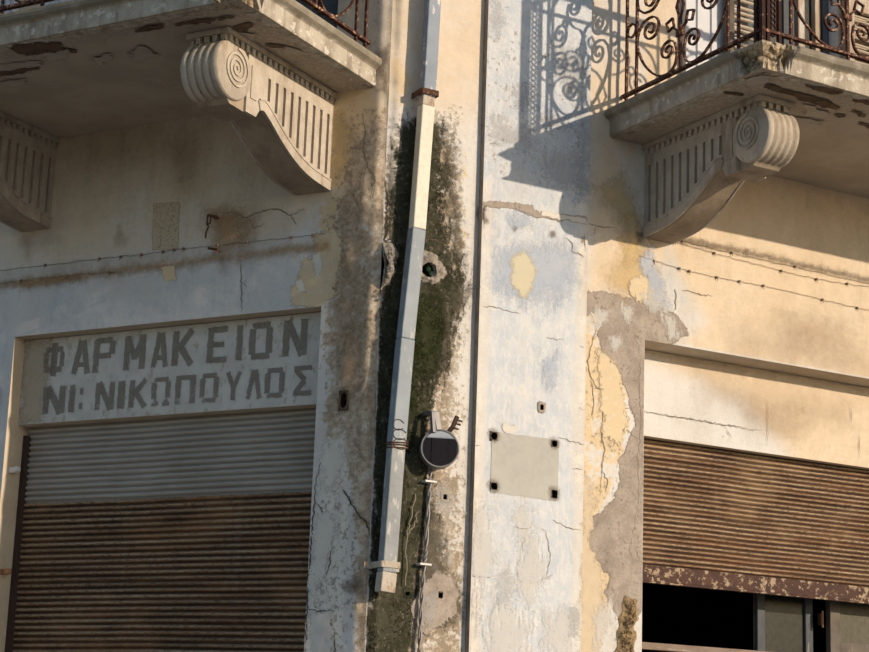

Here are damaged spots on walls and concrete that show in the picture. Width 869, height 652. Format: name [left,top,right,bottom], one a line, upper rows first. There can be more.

flaking render [330,114,351,179]
flaking render [421,250,447,285]
leakage [441,126,468,270]
crack [483,200,614,256]
spalling [723,54,869,129]
crack [305,464,336,652]
crack [342,489,370,530]
leakage [345,573,376,652]
leakage [372,330,387,538]
leakage [401,281,474,628]
flaking render [587,290,689,652]
crack [548,329,769,565]